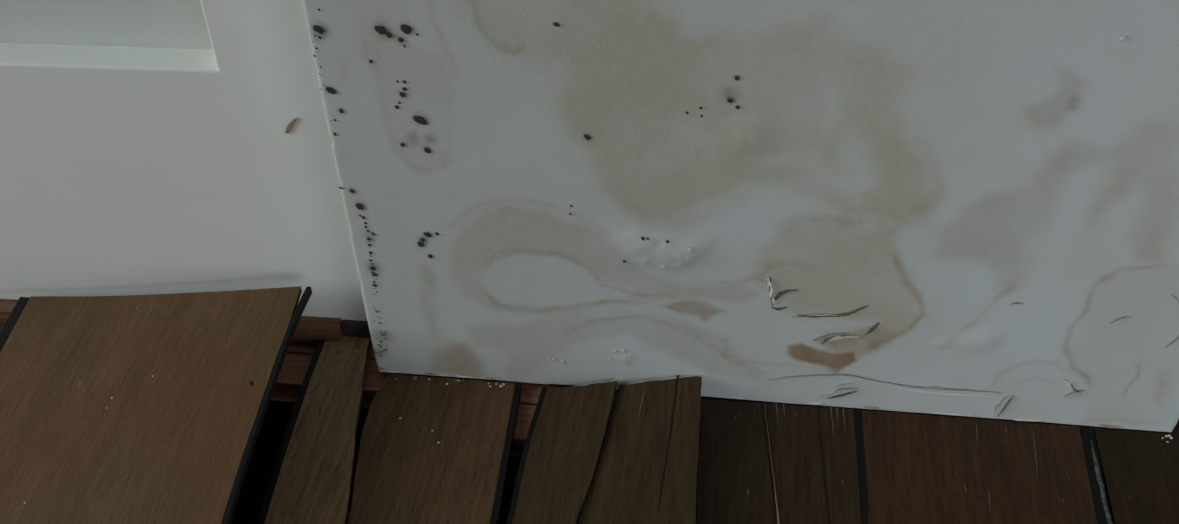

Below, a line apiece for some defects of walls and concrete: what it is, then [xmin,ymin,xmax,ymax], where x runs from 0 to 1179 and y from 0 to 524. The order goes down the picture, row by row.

damp [311,25,337,94]
damp [375,25,419,47]
damp [339,187,388,357]
crack [771,290,880,345]
crack [657,375,679,513]
crack [761,374,1002,524]